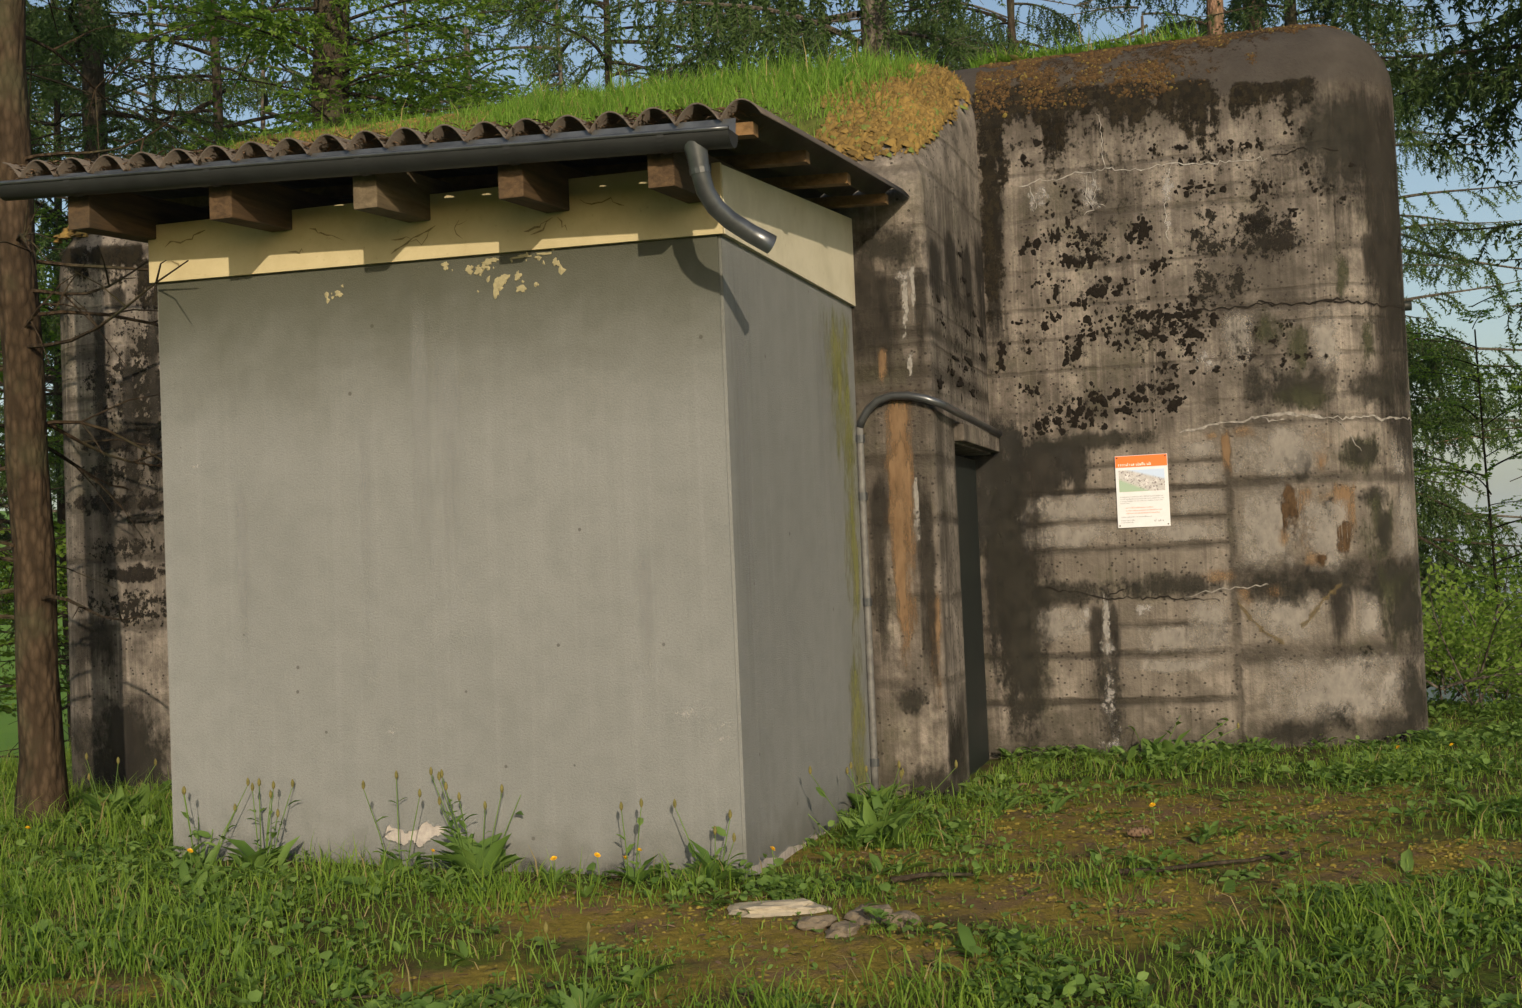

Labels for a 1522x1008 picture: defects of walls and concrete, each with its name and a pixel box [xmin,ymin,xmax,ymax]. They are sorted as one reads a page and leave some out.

peeling [441,249,566,299]
corrosion [878,348,886,379]
water stain [825,123,1011,642]
crack [1179,411,1412,449]
water stain [1197,90,1427,746]
corrosion [886,400,941,671]
water stain [913,478,938,675]
water stain [964,419,1220,752]
crack [1044,583,1267,601]
corrosion [1281,484,1356,567]
water stain [71,698,168,792]
peeling [383,820,448,849]